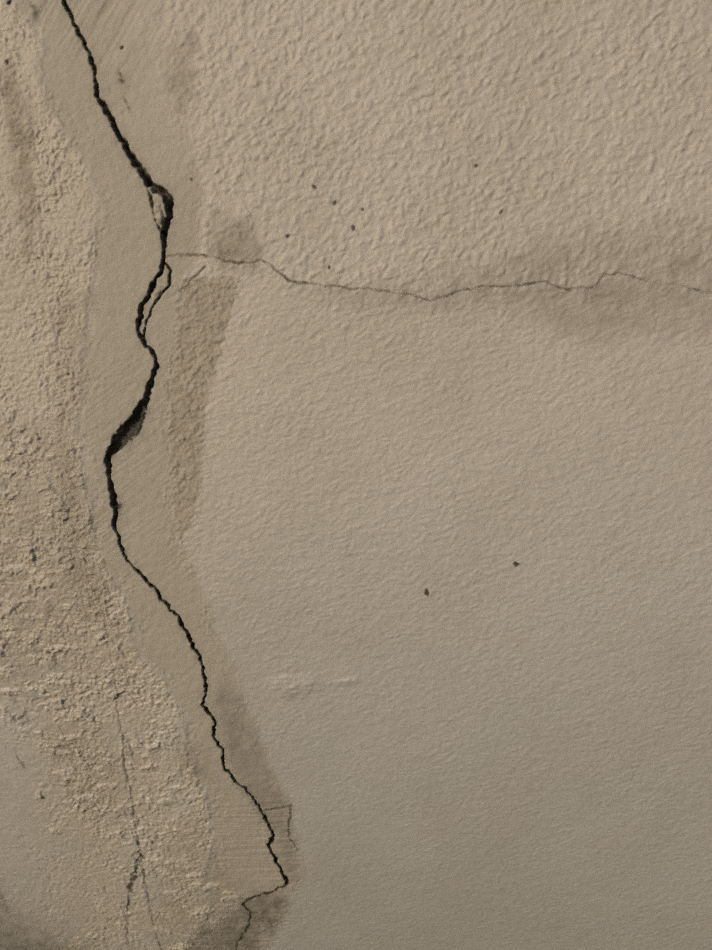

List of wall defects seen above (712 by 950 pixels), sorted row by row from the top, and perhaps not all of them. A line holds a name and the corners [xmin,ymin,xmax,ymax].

crack [63,0,291,950]